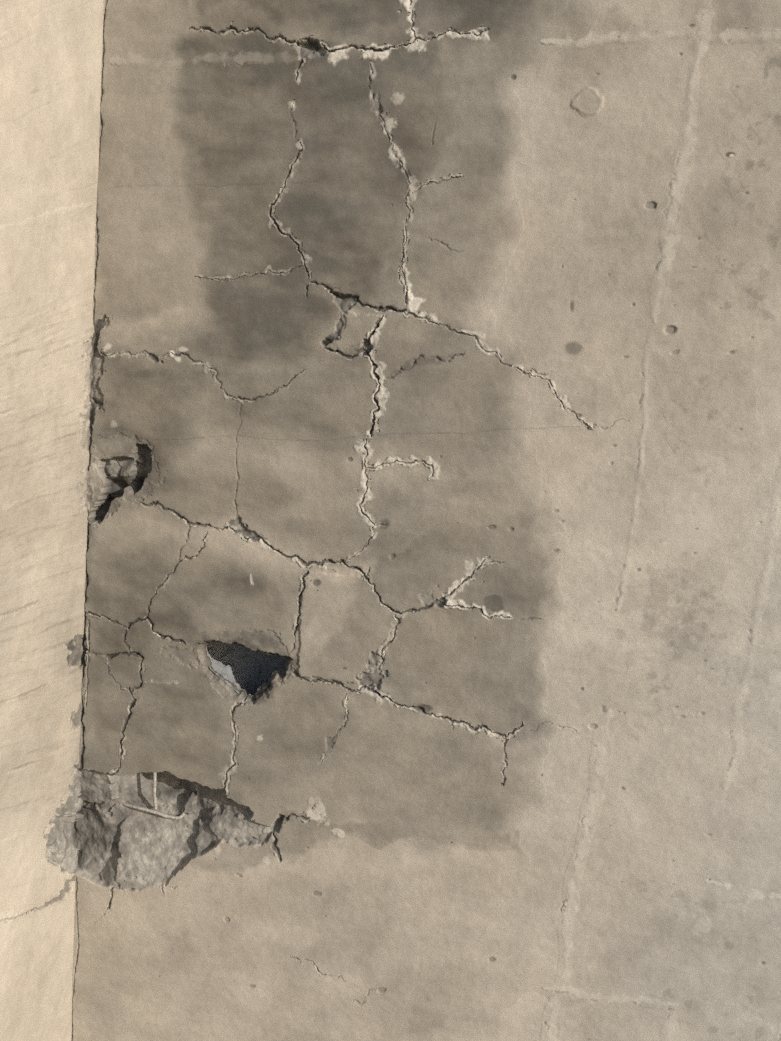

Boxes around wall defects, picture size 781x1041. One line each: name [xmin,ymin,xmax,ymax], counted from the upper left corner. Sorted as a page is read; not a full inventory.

hole [74,419,167,526]
water stain [74,0,603,876]
crack [62,0,633,795]
hole [197,627,297,708]
spalling [42,760,288,894]
crack [267,796,346,865]
crack [0,875,116,1041]